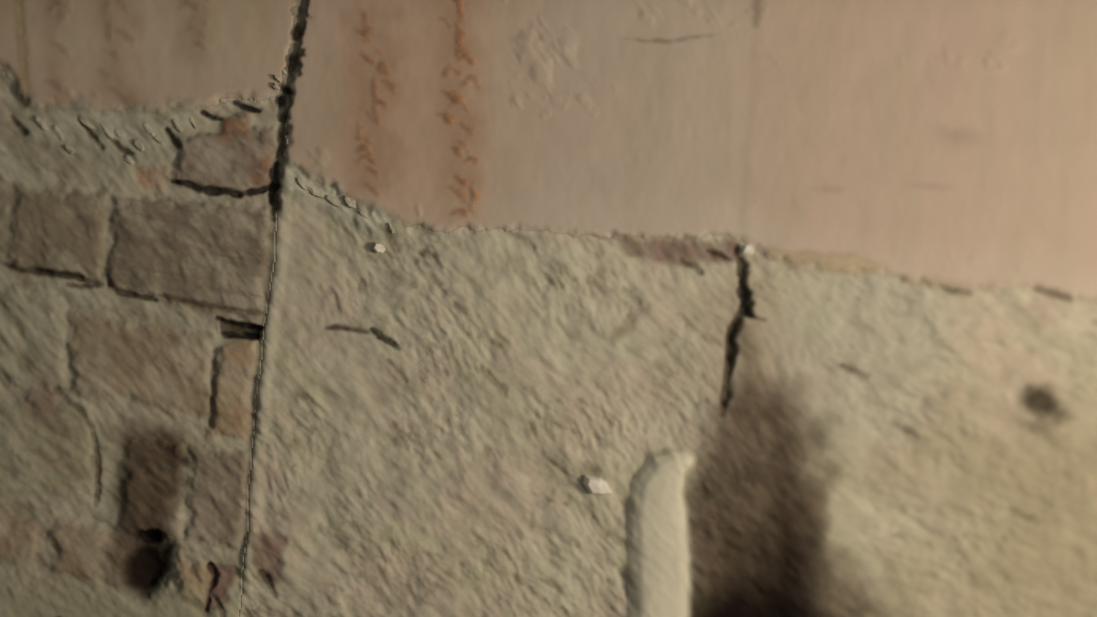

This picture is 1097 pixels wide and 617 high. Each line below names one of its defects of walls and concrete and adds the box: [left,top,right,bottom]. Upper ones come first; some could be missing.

spalling [15,101,196,165]
crack [171,0,308,220]
spalling [282,159,400,254]
spalling [624,238,754,268]
crack [720,245,765,416]